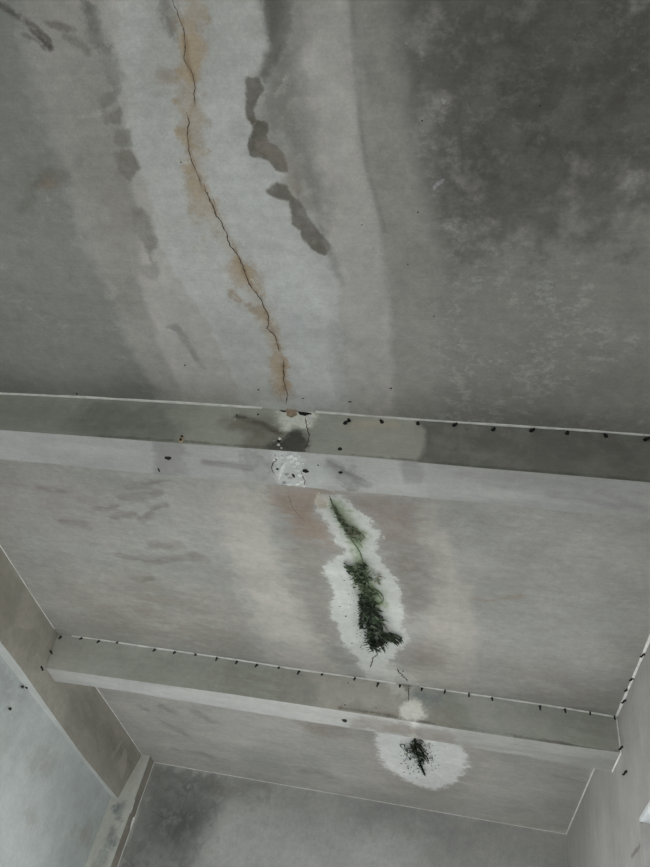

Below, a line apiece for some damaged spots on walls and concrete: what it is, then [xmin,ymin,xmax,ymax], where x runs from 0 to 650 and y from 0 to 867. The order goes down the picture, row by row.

rust [141,0,310,395]
crack [173,4,289,403]
damp [0,0,650,440]
damp [0,395,650,716]
damp [111,654,620,867]